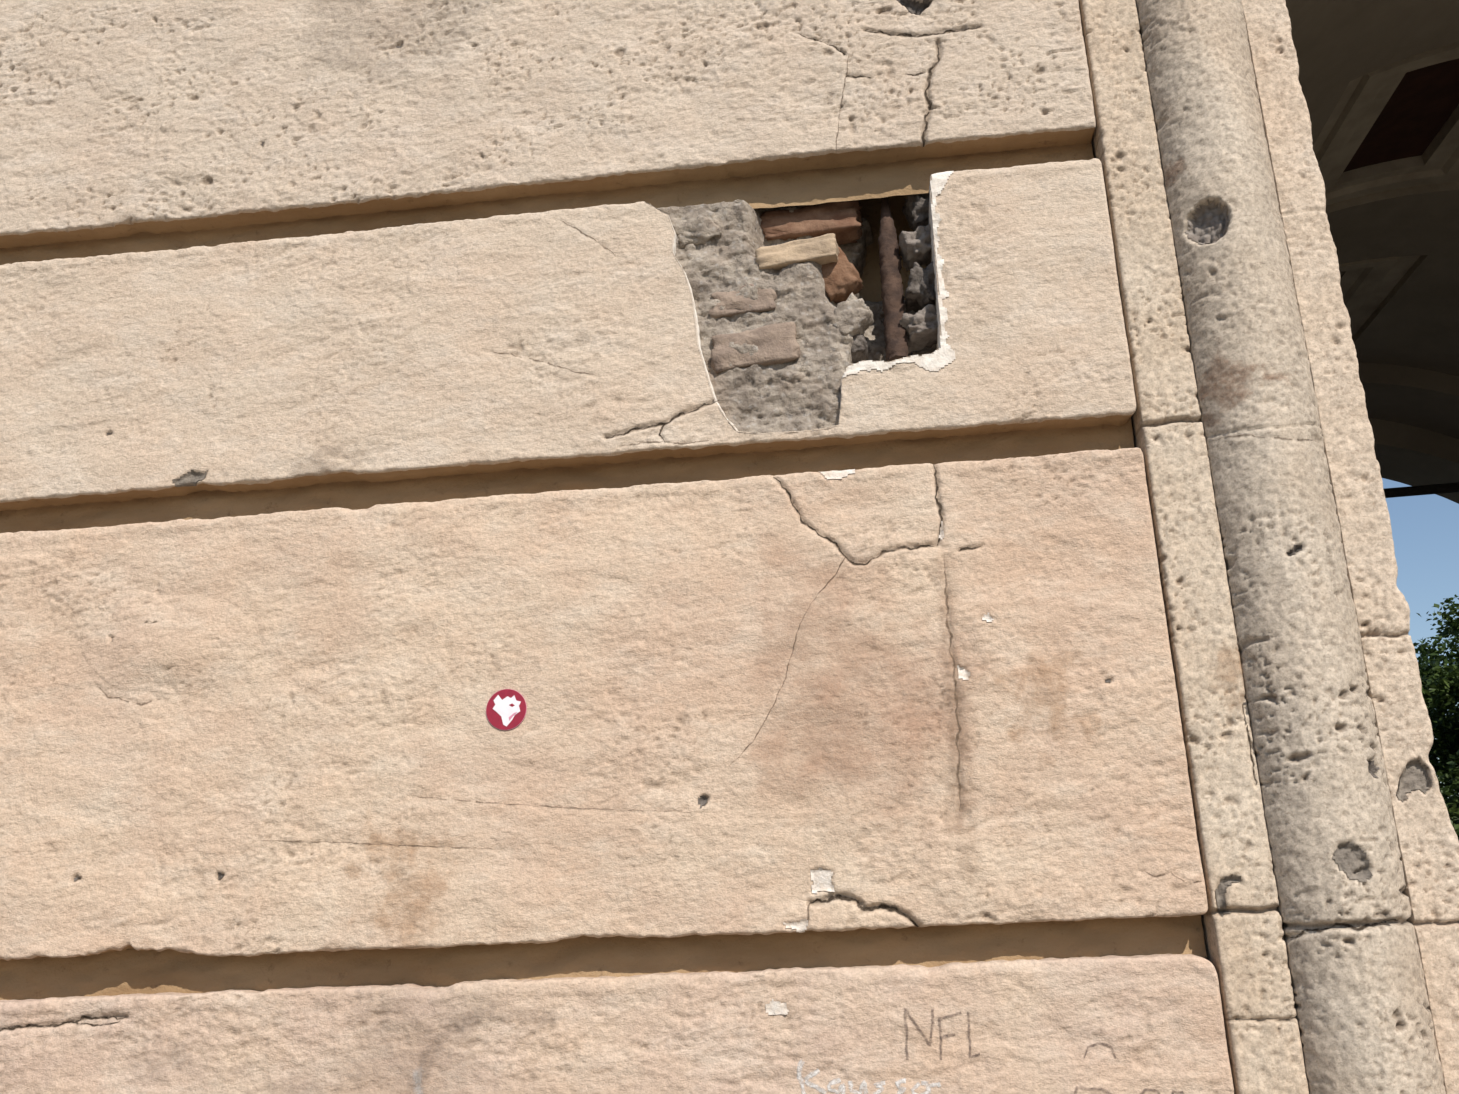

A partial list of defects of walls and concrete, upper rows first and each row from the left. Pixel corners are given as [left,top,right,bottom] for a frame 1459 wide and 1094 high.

crack [800,26,981,149]
spalling [646,171,956,433]
crack [608,400,719,446]
crack [737,466,981,798]
spalling [1397,760,1432,802]
spalling [1332,842,1373,882]
crack [808,894,919,927]